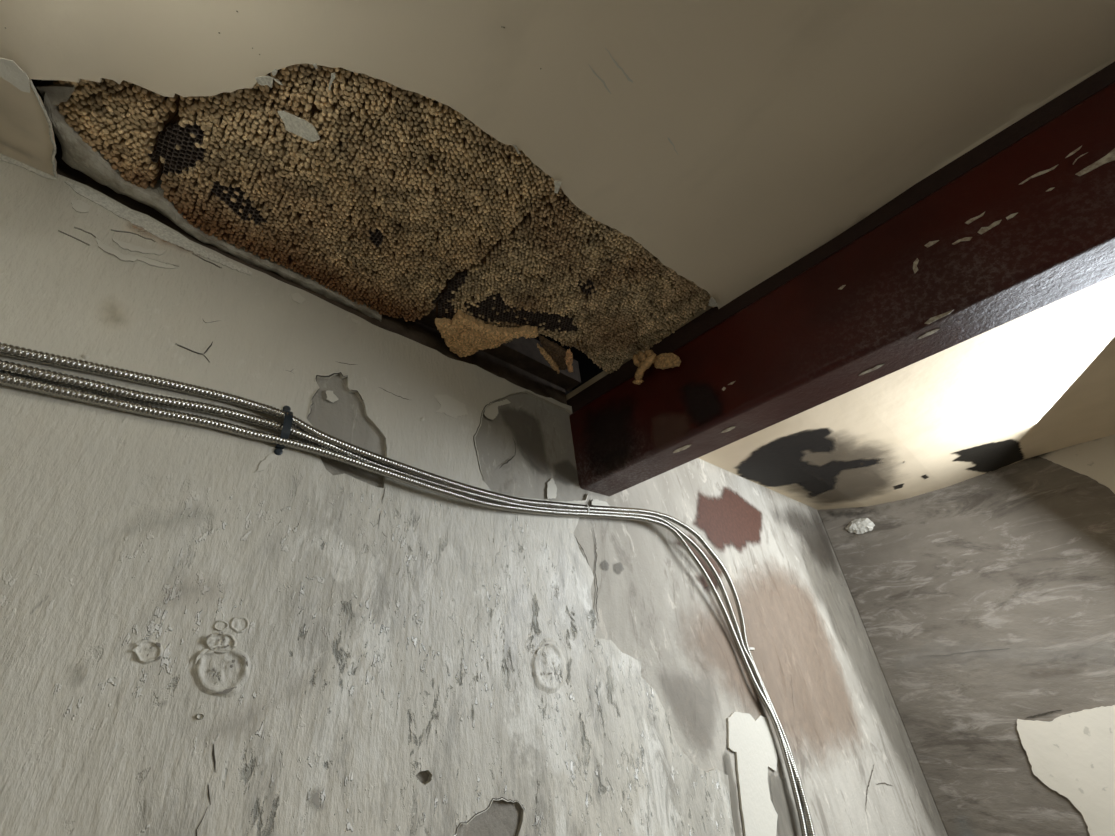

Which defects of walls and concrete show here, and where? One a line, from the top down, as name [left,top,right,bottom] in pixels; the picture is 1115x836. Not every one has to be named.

peeling [0,58,30,93]
peeling [255,69,283,88]
peeling [277,111,320,142]
peeling [0,153,252,276]
peeling [307,375,385,457]
peeling [320,456,384,488]
leakage [737,428,879,496]
peeling [475,393,1115,836]
peeling [456,799,521,836]